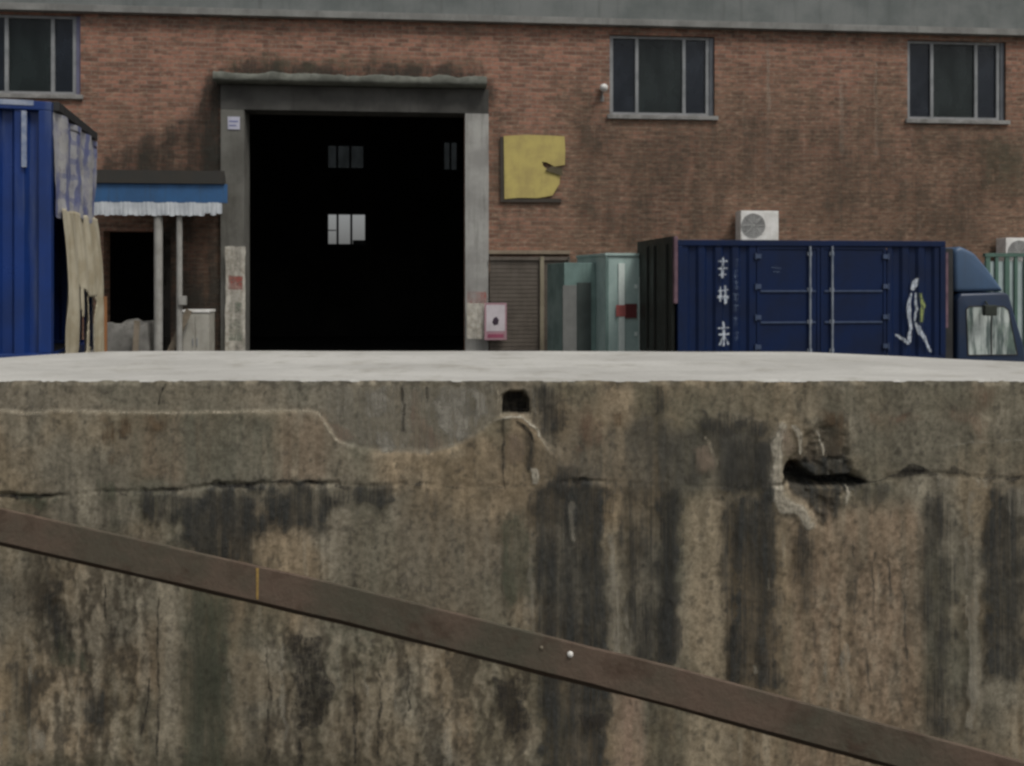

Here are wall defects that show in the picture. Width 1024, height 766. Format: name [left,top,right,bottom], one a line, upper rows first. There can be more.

crack [0,492,51,500]
damp [140,480,395,561]
crack [211,479,358,489]
crack [489,415,546,489]
damp [528,384,683,664]
damp [700,410,785,690]
spalling [767,424,887,530]
crack [887,441,1021,481]
damp [923,479,1024,735]
damp [537,675,615,766]